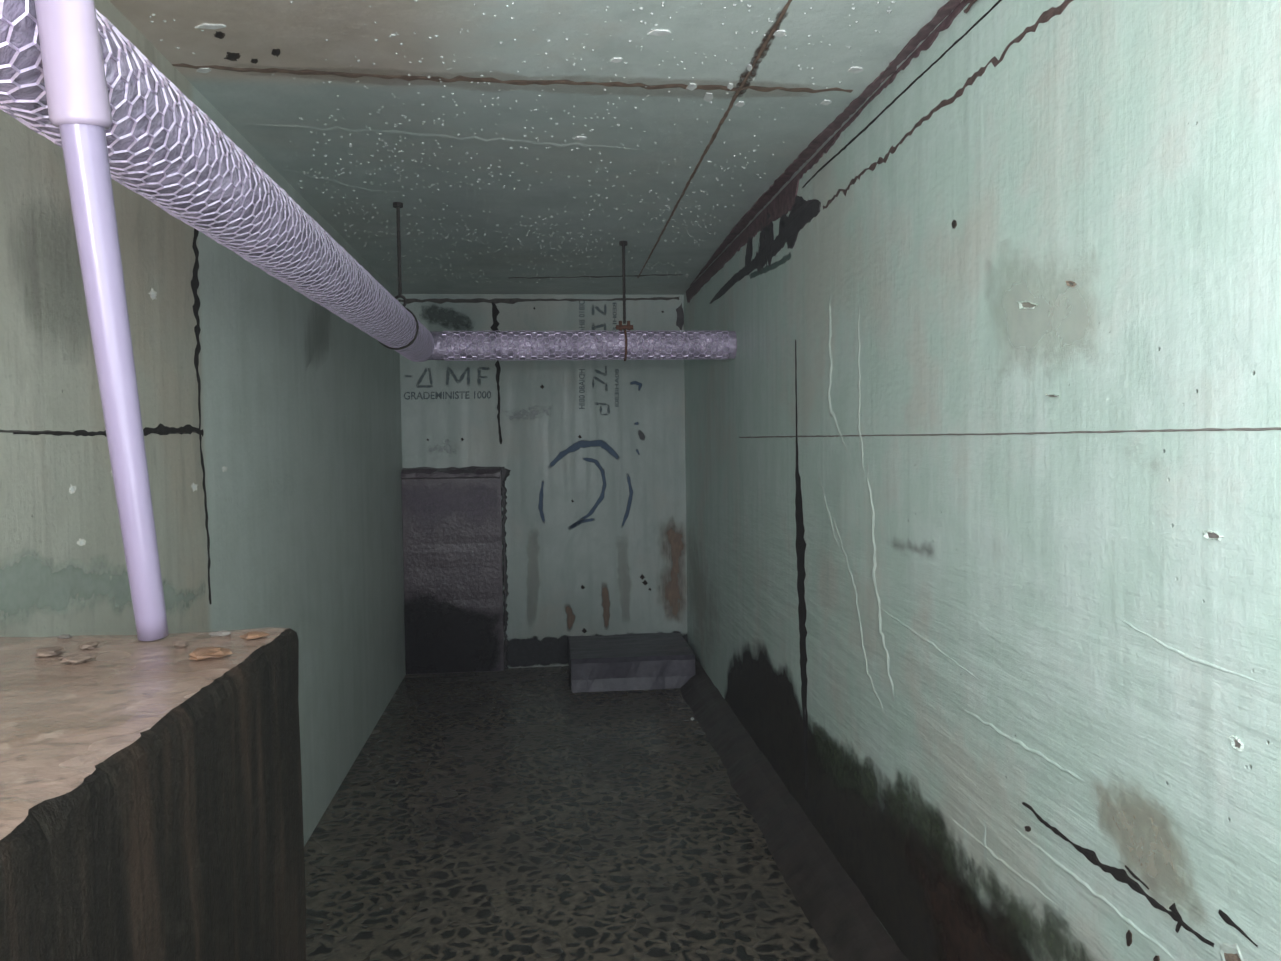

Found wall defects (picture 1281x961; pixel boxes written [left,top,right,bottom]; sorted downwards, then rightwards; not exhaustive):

crack [802,0,1073,210]
crack [172,0,853,444]
corrosion [565,606,575,630]
corrosion [602,585,610,628]
corrosion [663,525,684,619]
crack [739,340,1281,800]
water stain [725,647,1090,961]
crack [1022,802,1258,948]
spalling [1219,943,1246,961]